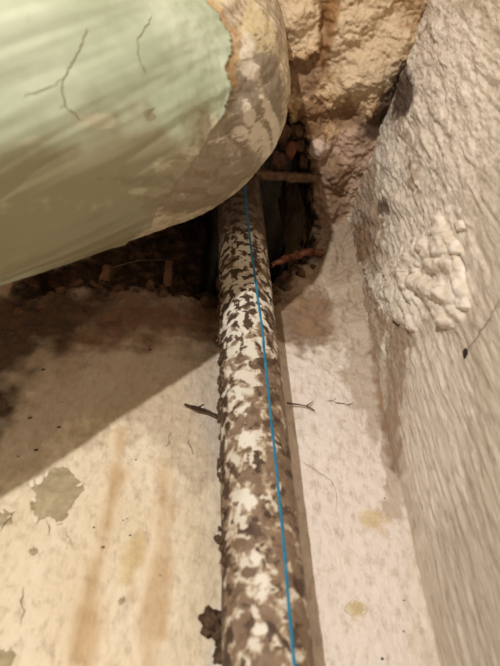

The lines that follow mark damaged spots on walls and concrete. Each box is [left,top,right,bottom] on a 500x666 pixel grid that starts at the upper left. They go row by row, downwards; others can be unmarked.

crack [23,28,87,120]
peeling [29,467,84,524]